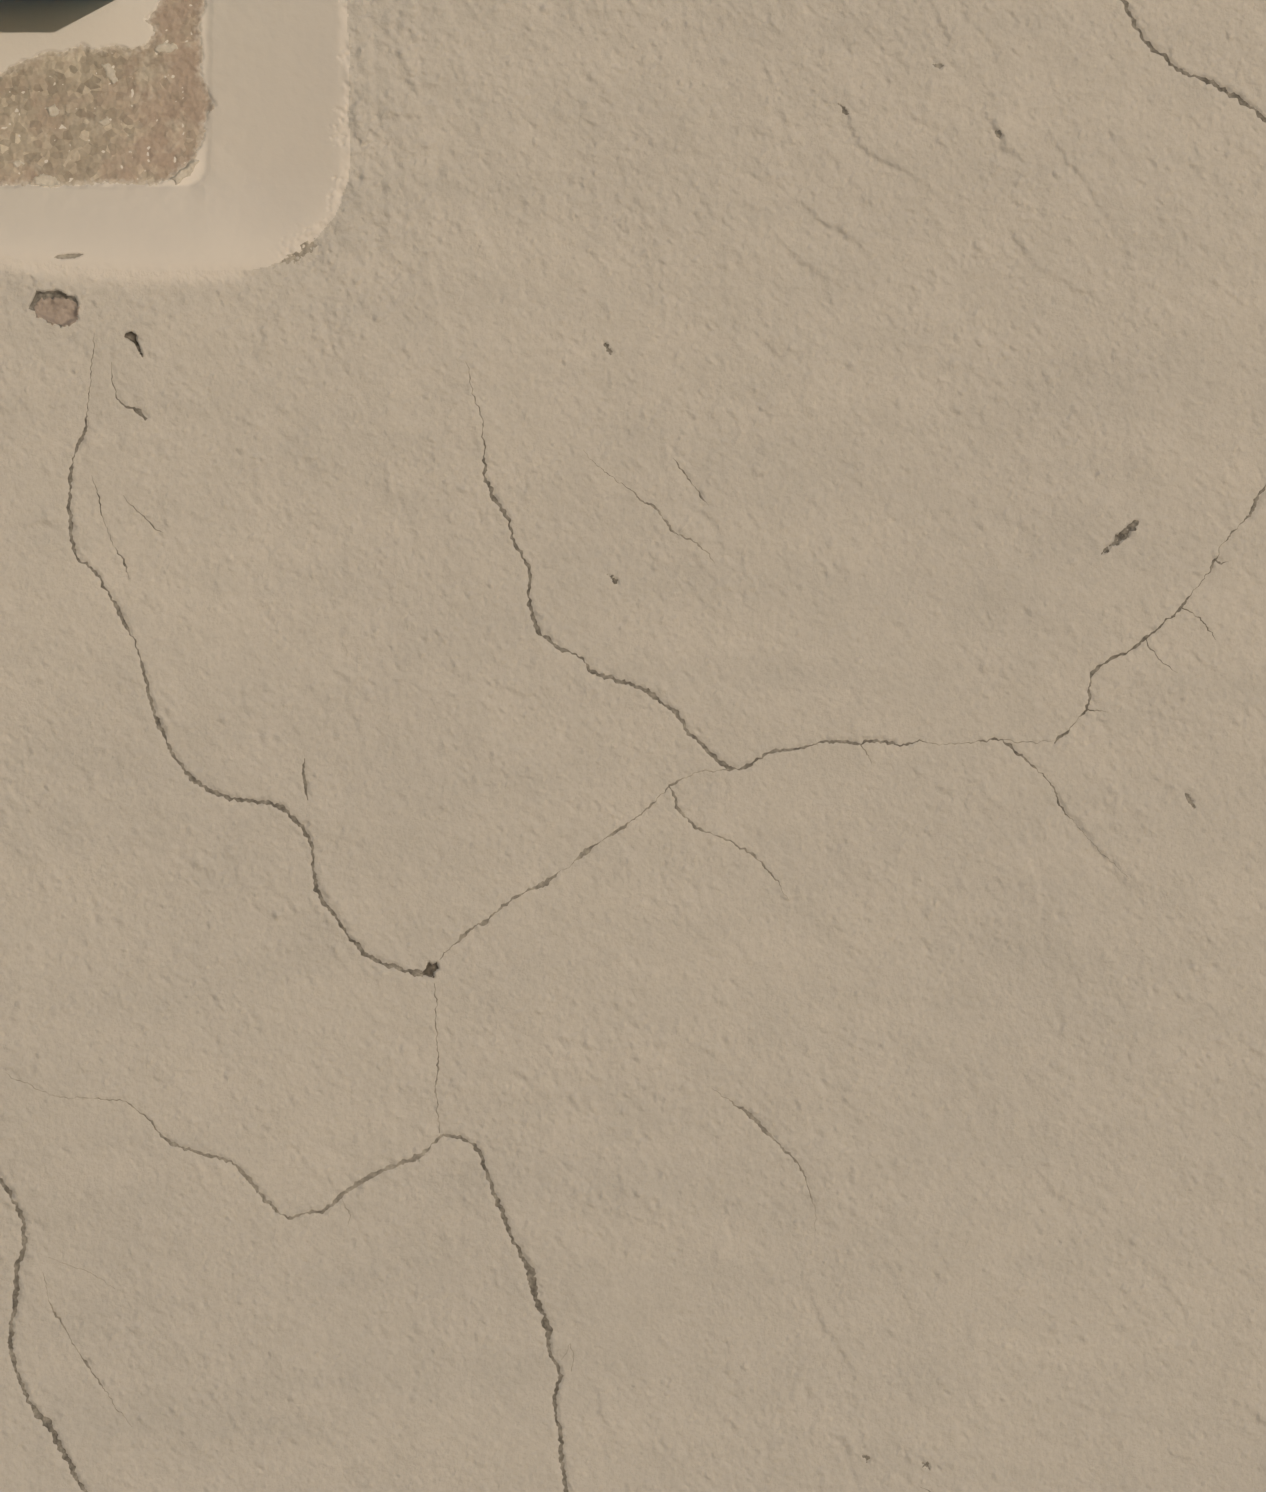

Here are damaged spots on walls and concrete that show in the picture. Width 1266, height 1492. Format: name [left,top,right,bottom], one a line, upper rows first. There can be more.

spalling [0,0,215,188]
crack [1121,0,1266,122]
spalling [29,290,80,328]
crack [0,338,1266,1492]